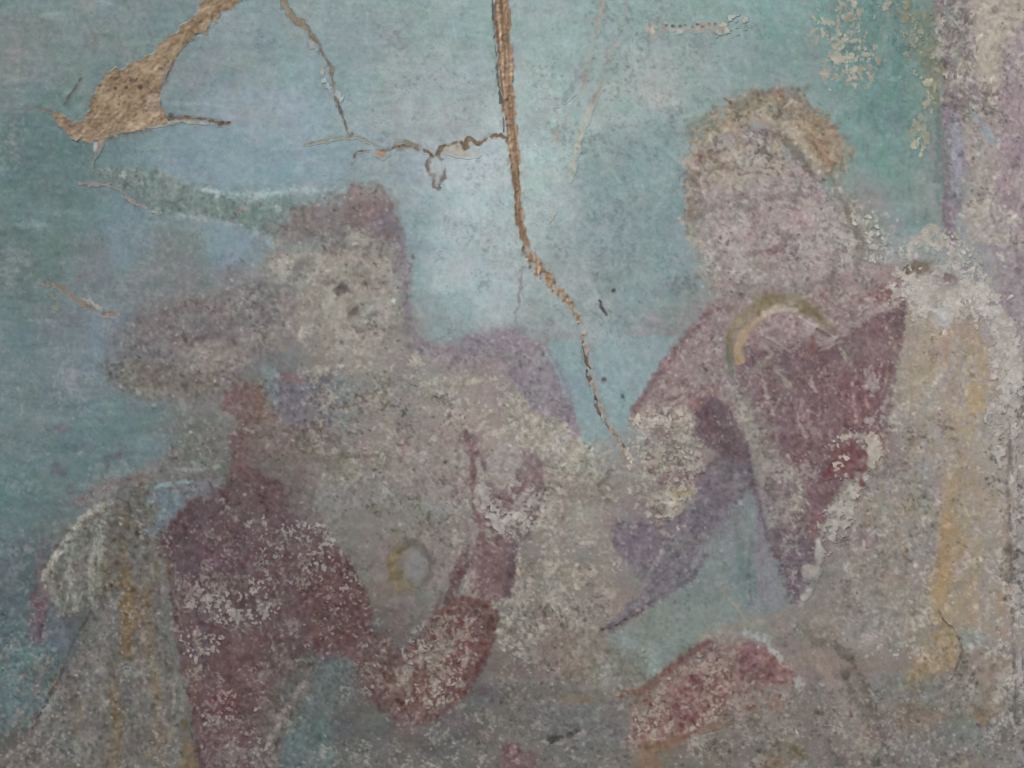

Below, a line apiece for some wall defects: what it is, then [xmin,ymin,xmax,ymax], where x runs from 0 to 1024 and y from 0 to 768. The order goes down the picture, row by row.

spalling [22,0,244,169]
peeling [808,0,979,159]
crack [76,179,160,216]
crack [279,0,642,503]
flaking render [799,424,884,602]